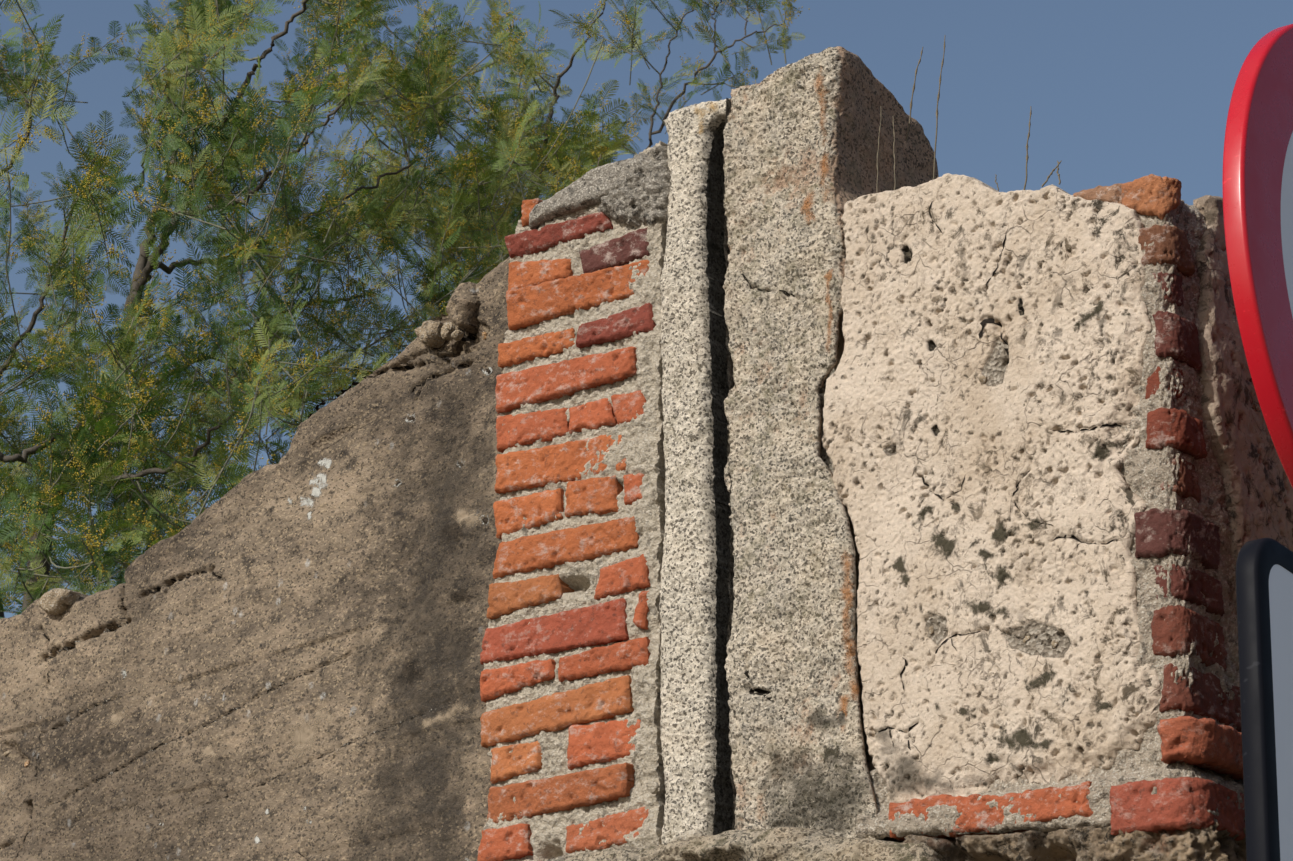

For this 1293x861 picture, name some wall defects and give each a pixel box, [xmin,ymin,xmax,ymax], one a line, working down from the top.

crack [0,571,341,858]
crack [192,698,460,809]